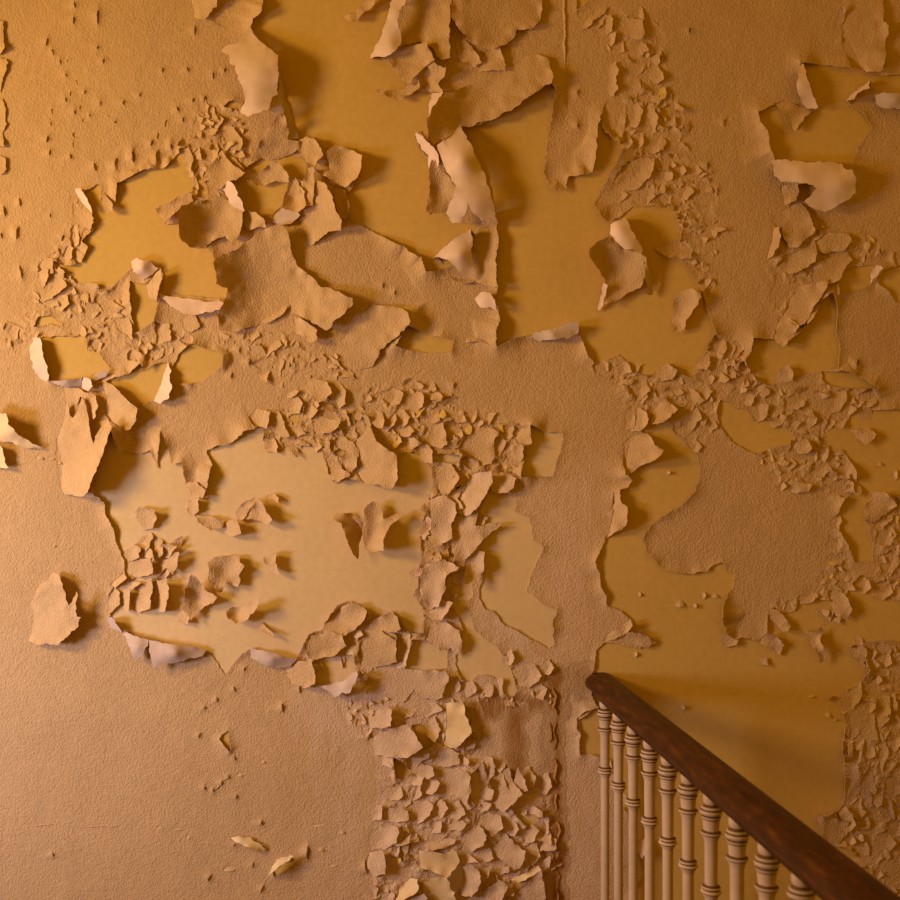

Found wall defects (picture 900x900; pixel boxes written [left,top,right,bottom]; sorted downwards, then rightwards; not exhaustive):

spalling [192,0,217,35]
peeling [582,5,631,96]
peeling [620,6,666,98]
spalling [0,21,8,174]
peeling [610,136,676,206]
peeling [686,0,900,562]
peeling [0,413,44,469]
peeling [507,417,563,478]
peeling [28,572,81,645]
peeling [854,693,900,772]
peeling [382,691,562,900]
peeling [365,800,433,877]